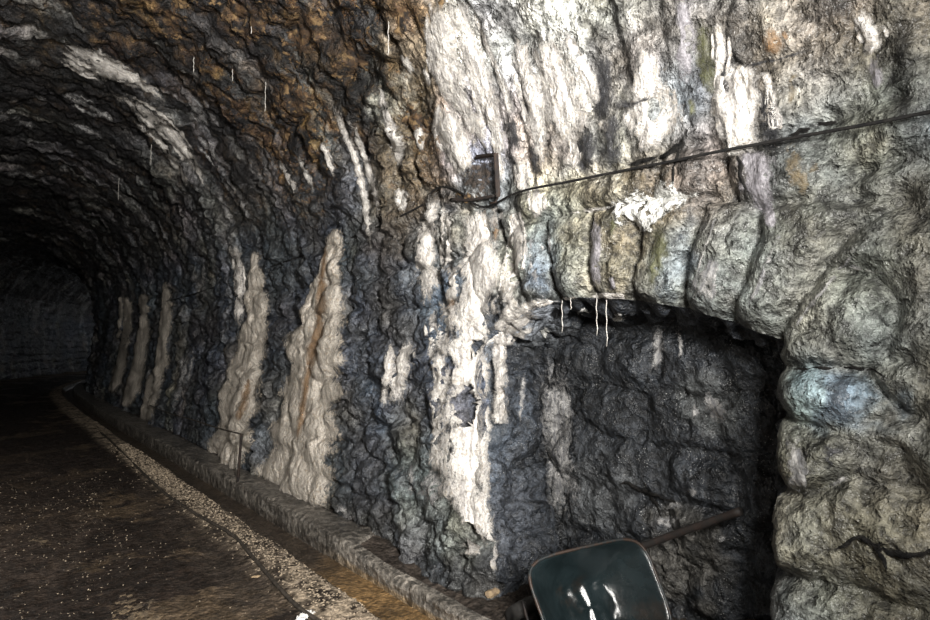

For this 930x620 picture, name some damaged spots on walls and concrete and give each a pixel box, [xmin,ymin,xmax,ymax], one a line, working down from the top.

water stain [380,91,405,166]
water stain [623,43,694,153]
water stain [573,178,696,299]
water stain [231,247,246,326]
water stain [409,2,613,570]
rust [297,250,327,434]
water stain [381,342,415,403]
water stain [653,330,663,366]
water stain [657,502,682,527]